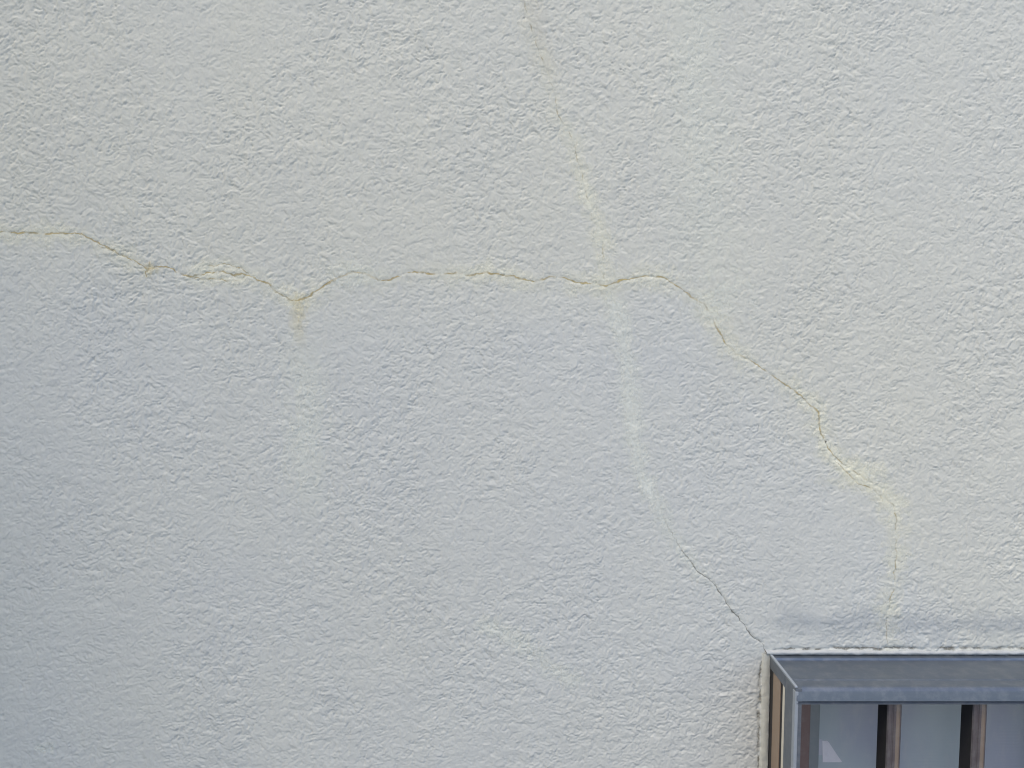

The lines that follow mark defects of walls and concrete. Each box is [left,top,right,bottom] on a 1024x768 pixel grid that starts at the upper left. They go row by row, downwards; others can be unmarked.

crack [0,231,105,246]
crack [128,258,725,509]
crack [754,363,905,520]